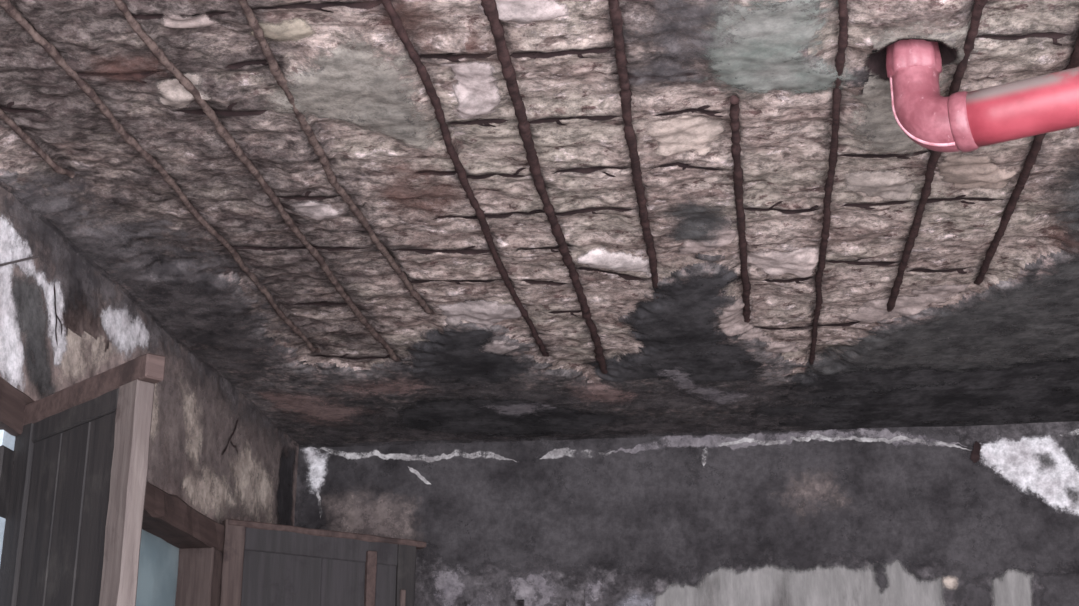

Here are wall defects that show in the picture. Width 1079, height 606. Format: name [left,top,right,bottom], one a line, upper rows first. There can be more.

water stain [0,216,119,399]
crack [214,245,645,317]
spalling [0,0,1079,407]
corrosion [481,0,608,374]
crack [419,47,699,81]
corrosion [608,0,659,298]
corrosion [729,95,751,323]
corrosion [809,0,849,365]
water stain [304,447,412,539]
crack [310,428,968,484]
peeling [623,560,957,606]
peeling [993,570,1032,606]